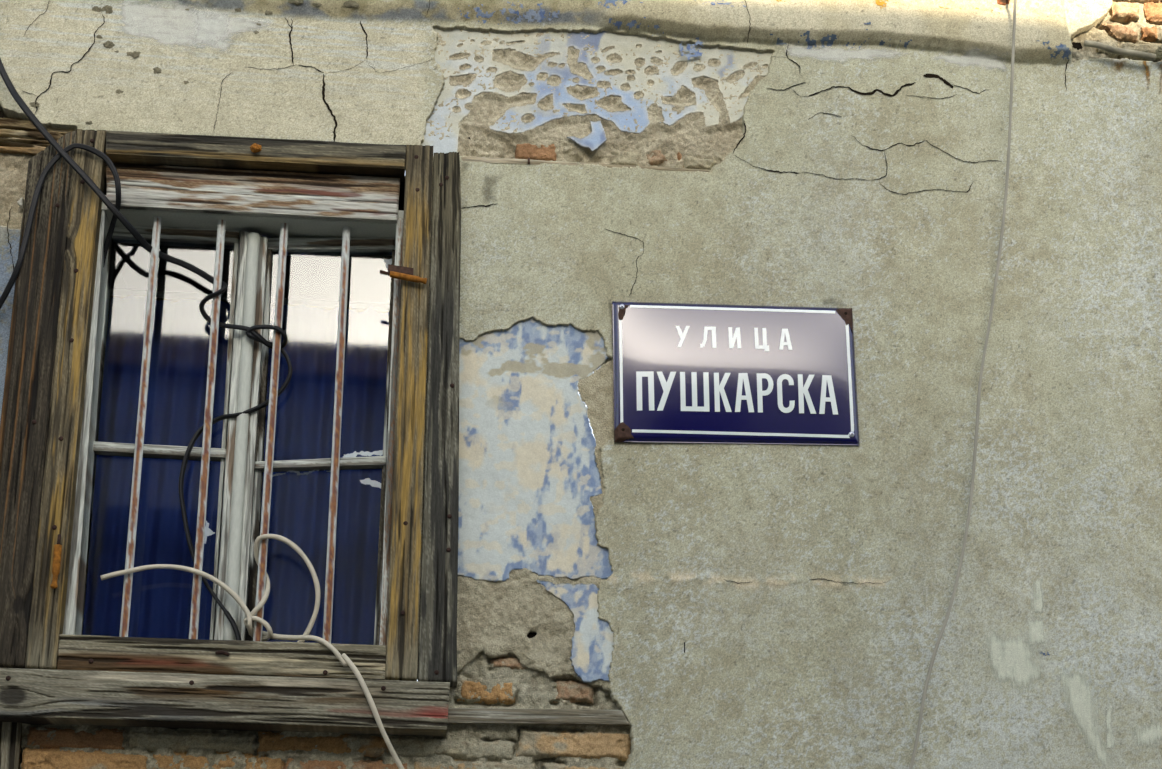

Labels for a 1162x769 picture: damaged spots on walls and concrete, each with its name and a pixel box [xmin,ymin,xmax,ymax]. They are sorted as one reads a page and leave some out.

crack [23,14,105,115]
crack [213,18,432,142]
spalling [421,0,912,170]
crack [733,44,1002,195]
spalling [1037,0,1162,63]
spalling [0,153,33,229]
peeling [448,318,620,710]
spalling [20,723,631,769]